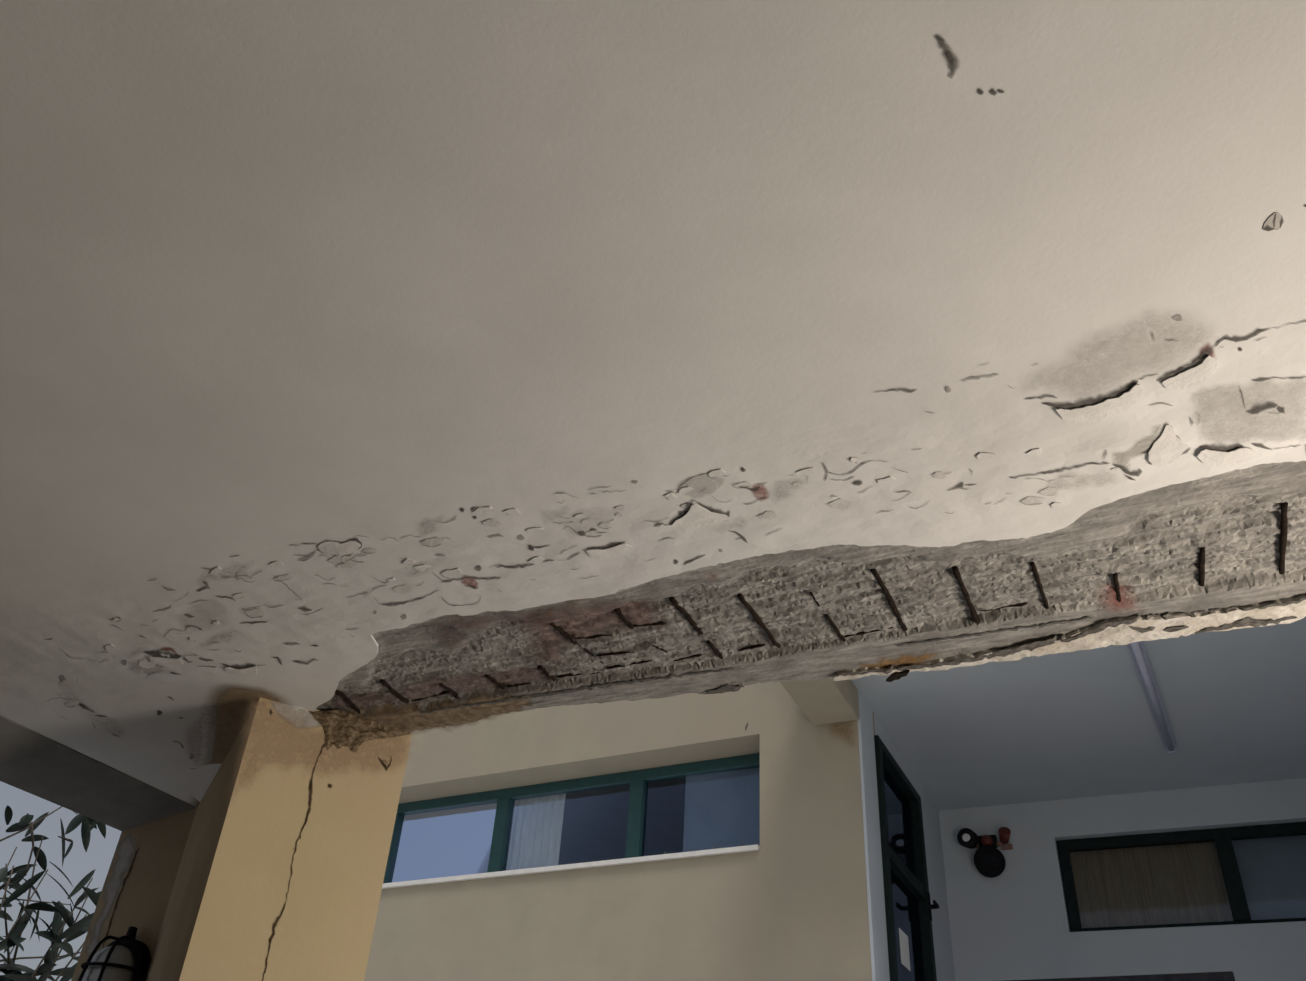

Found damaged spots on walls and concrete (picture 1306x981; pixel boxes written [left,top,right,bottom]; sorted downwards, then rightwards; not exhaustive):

hole [936,35,957,78]
peeling [1263,213,1284,231]
peeling [44,481,637,678]
spalling [309,315,1306,752]
rust [332,599,658,708]
leakage [209,687,405,770]
crack [262,743,333,981]